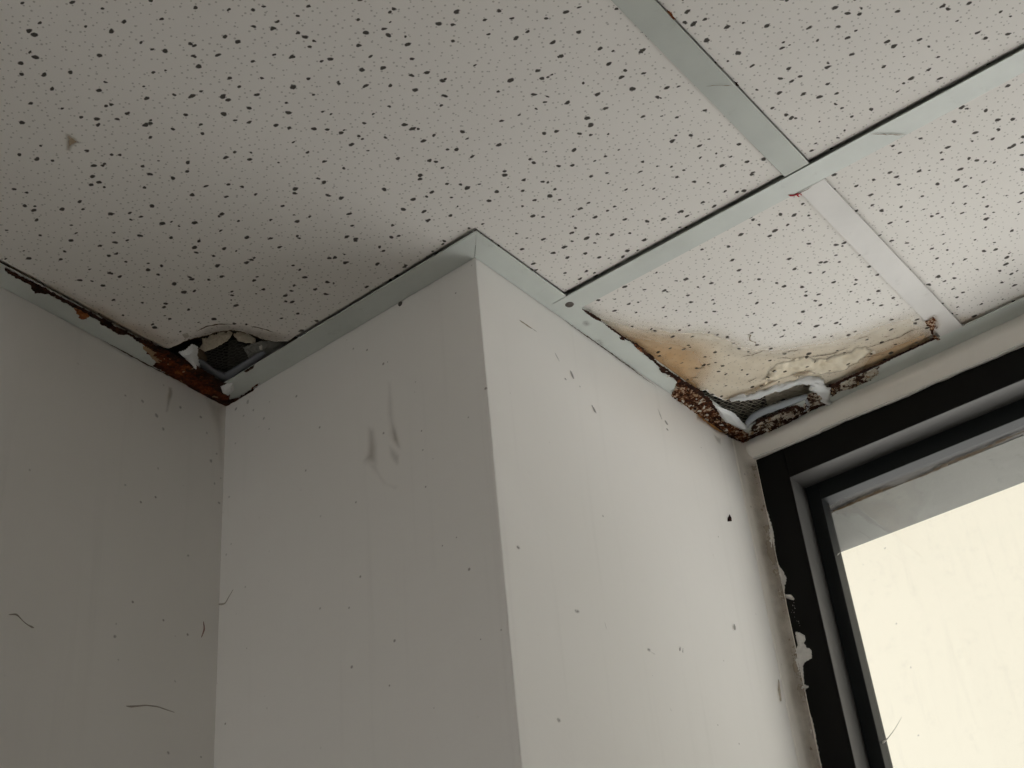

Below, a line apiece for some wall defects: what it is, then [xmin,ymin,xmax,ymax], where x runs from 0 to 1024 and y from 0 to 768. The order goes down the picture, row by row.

rust [5,268,258,406]
rust [582,309,940,443]
leakage [608,325,928,400]